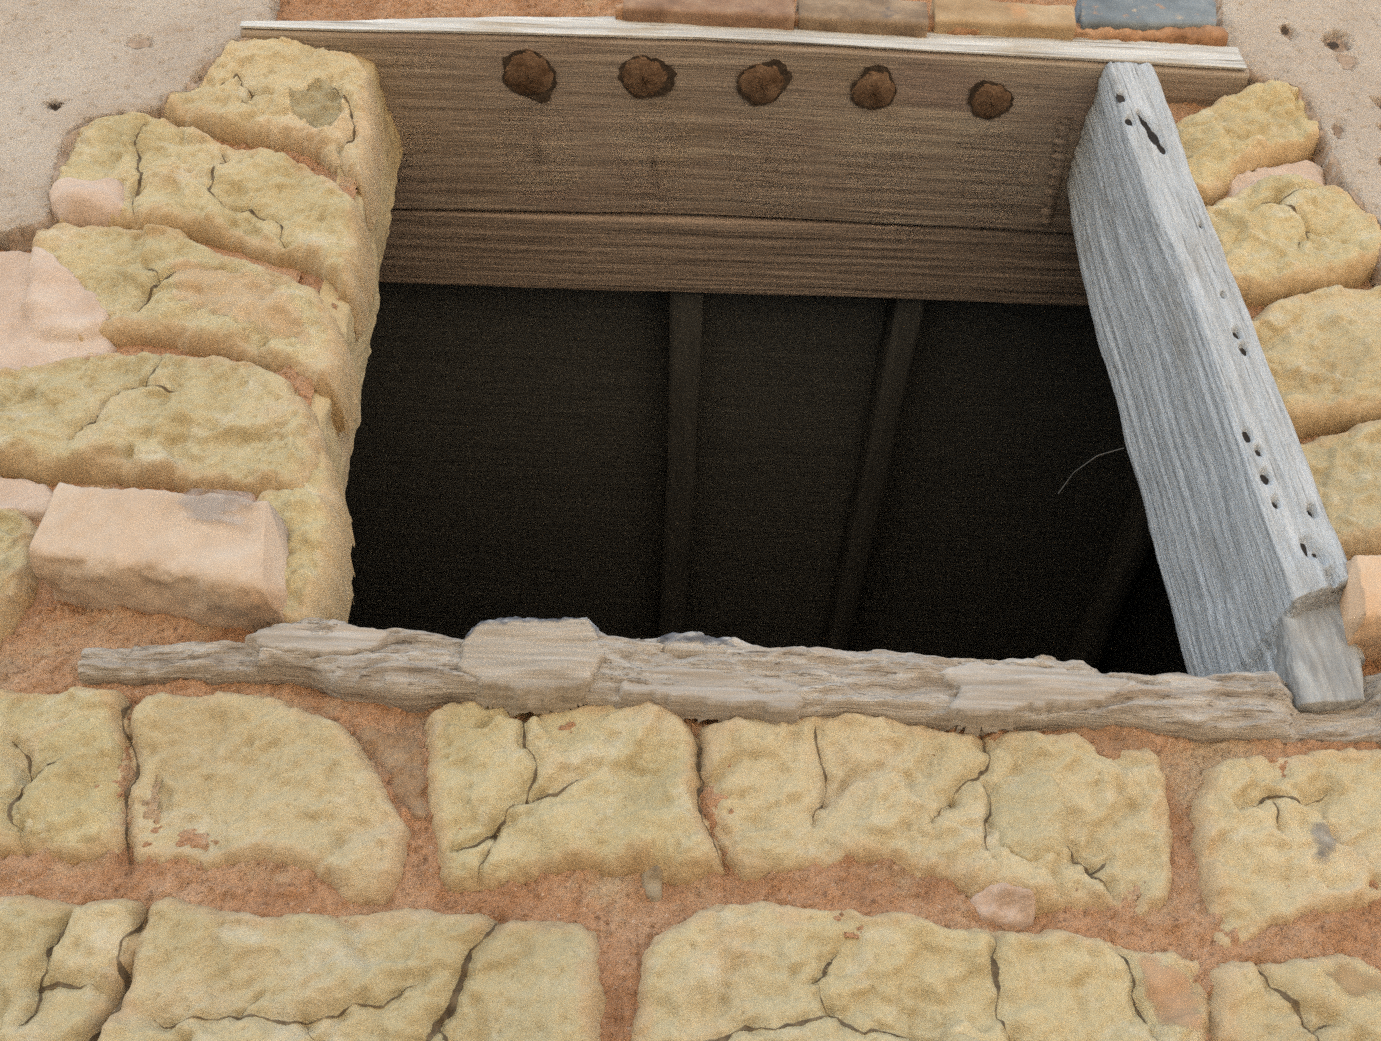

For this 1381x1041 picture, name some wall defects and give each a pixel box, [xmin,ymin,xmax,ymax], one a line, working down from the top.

crack [132,124,145,217]
crack [207,155,285,248]
crack [7,742,62,853]
crack [122,703,139,867]
crack [459,712,581,883]
crack [933,736,991,850]
crack [1067,845,1109,891]
crack [19,906,147,1041]
crack [154,923,497,1041]
crack [708,957,910,1041]
crack [991,938,1010,1038]
crack [1258,970,1331,1041]